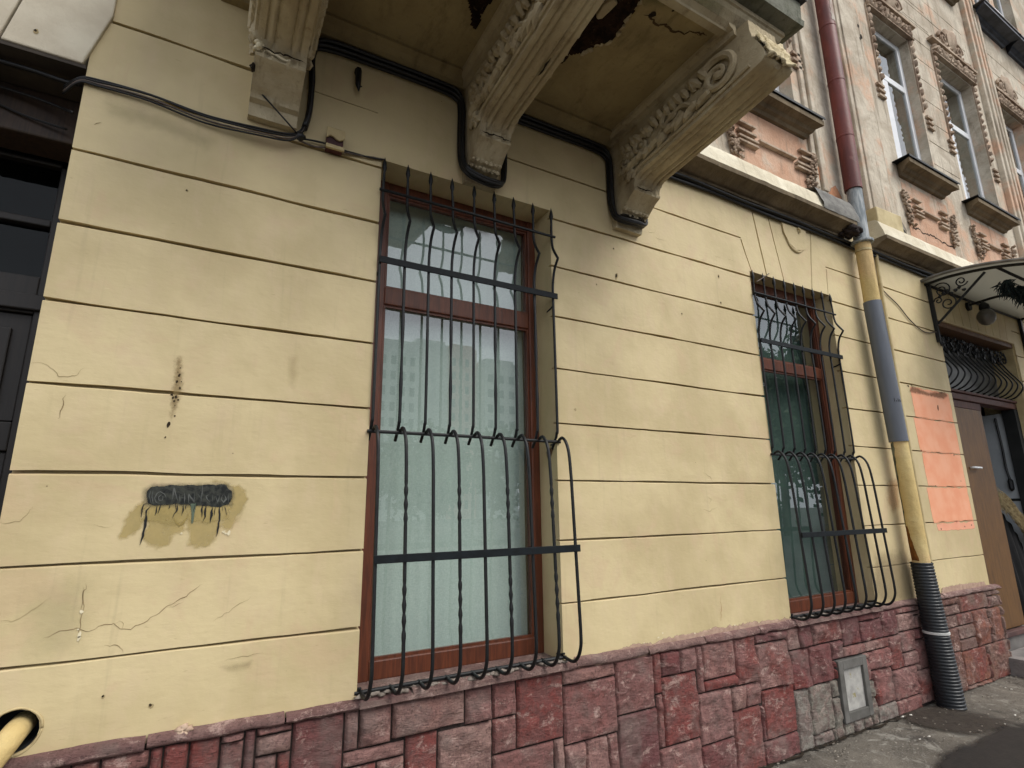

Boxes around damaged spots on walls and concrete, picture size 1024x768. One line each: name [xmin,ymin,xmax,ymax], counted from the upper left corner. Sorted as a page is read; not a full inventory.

flaking render [468,0,493,29]
flaking render [564,0,642,61]
crack [645,10,707,36]
crack [49,586,199,646]